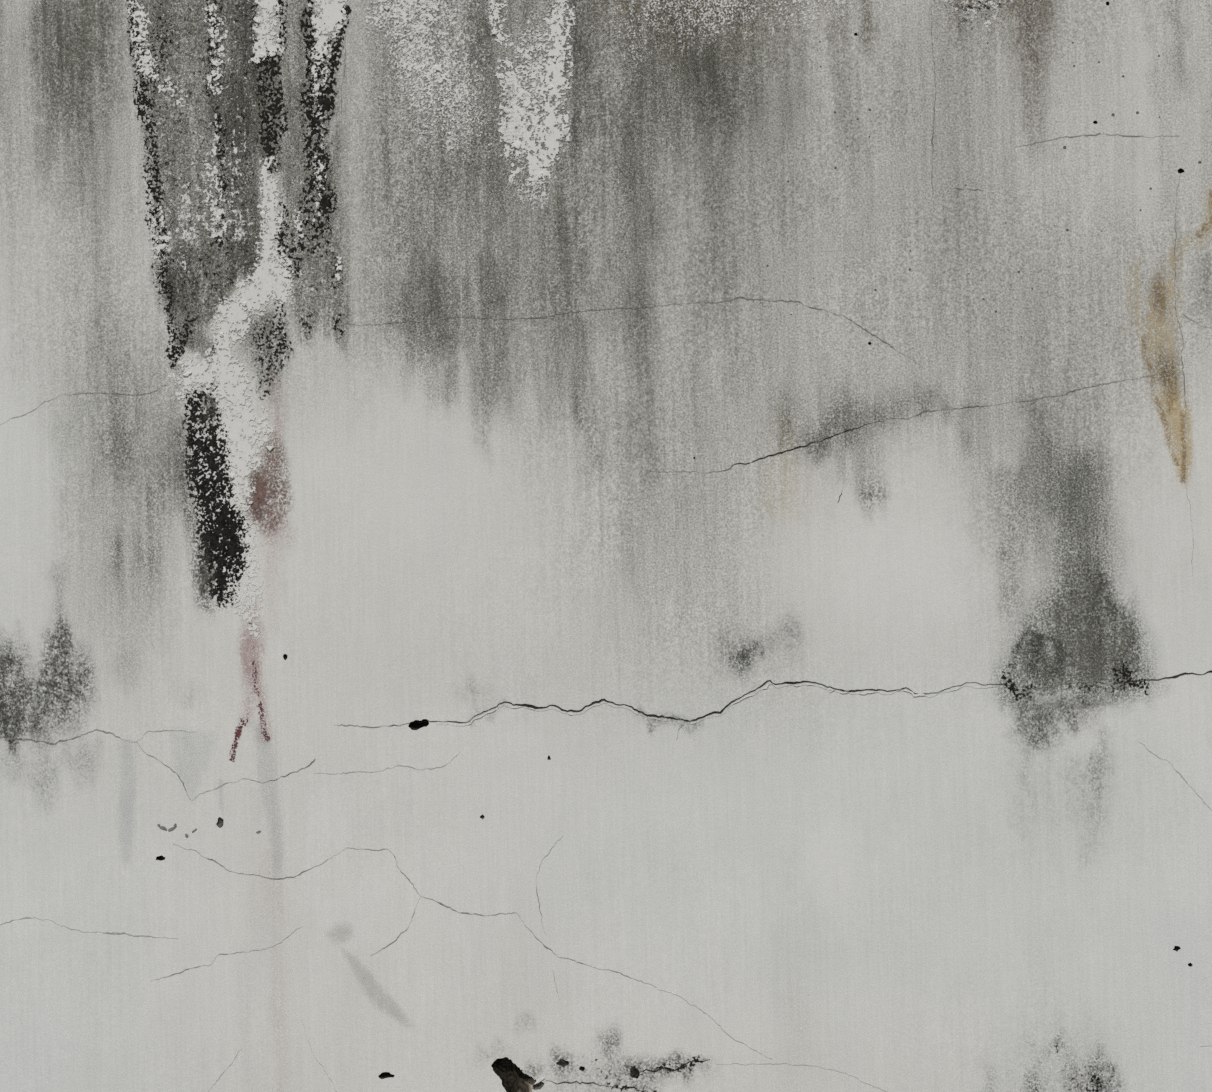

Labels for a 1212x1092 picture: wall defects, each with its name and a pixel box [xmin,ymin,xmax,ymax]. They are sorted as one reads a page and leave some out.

damp [33,0,351,400]
damp [374,0,770,364]
damp [0,618,90,750]
damp [147,383,251,608]
crack [0,729,458,797]
crack [338,671,1212,740]
crack [650,375,1151,473]
damp [1001,442,1149,744]
rust [1135,256,1192,482]
flaking render [491,1057,545,1092]
crack [184,840,879,1092]
damp [1072,1065,1119,1092]